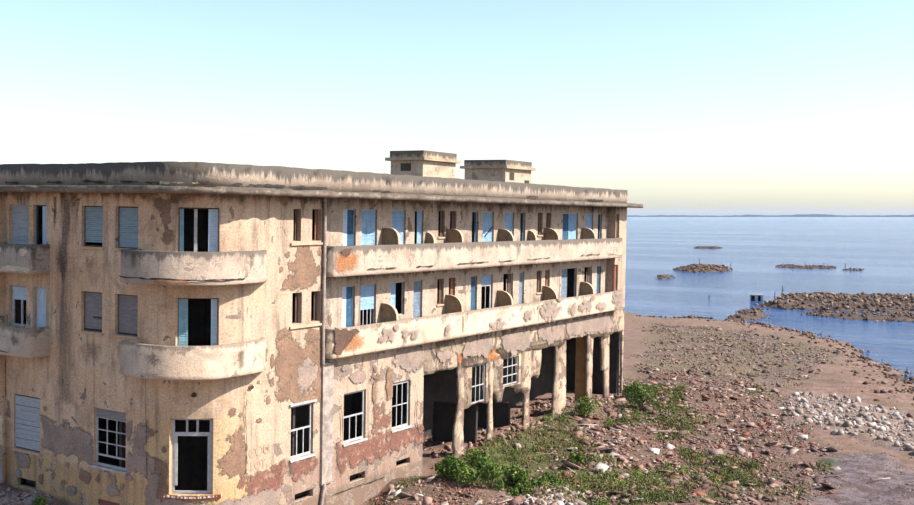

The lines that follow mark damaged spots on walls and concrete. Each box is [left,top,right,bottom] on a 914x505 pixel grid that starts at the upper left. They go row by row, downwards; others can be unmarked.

water stain [54,196,79,277]
peeling [150,195,175,245]
peeling [279,241,323,292]
rust [335,253,358,273]
flaking render [437,290,625,363]
peeling [249,328,327,405]
flaking render [334,324,428,475]
flaking render [39,406,319,505]